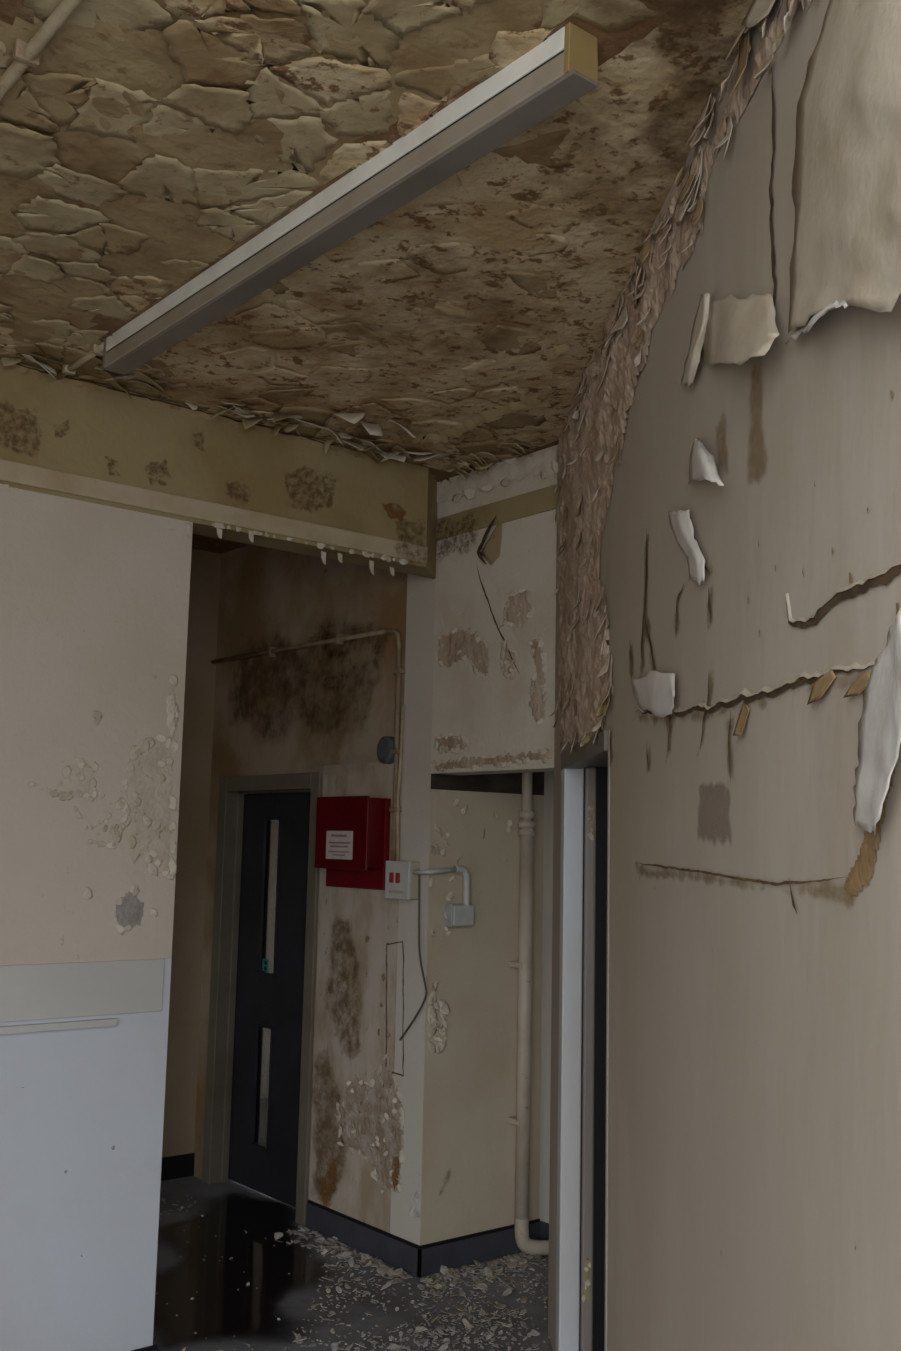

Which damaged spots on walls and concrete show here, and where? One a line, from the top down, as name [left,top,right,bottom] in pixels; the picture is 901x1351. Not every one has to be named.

peeling [0,0,812,773]
crack [785,560,901,629]
leakage [698,785,729,842]
leakage [328,921,359,1056]
leakage [314,1060,344,1197]